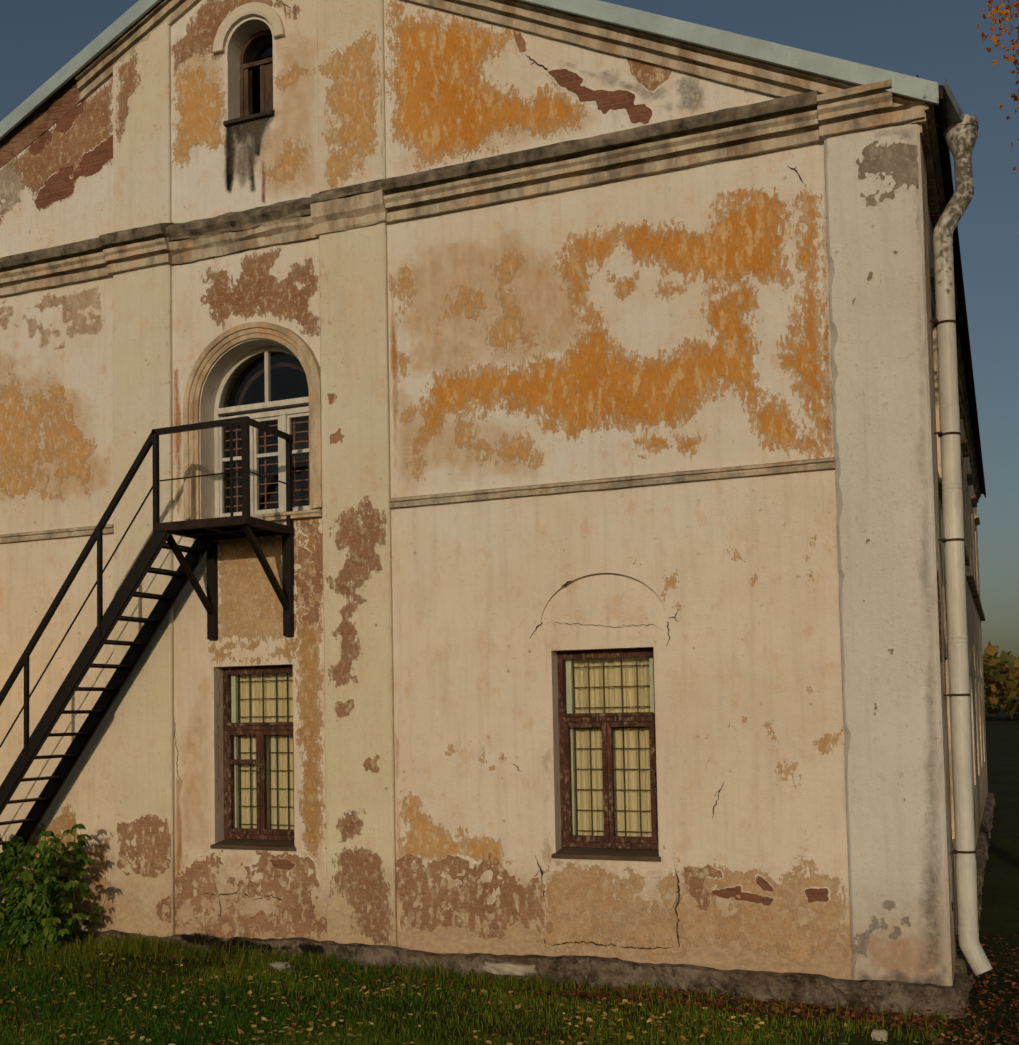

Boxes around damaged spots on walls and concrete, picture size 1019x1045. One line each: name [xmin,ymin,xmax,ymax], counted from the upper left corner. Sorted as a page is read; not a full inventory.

spalling [0,53,141,221]
peeling [264,138,312,184]
peeling [275,0,676,190]
spalling [200,248,320,337]
peeling [389,266,416,321]
peeling [397,186,833,480]
peeling [0,365,98,511]
crack [530,613,678,647]
peeling [22,496,913,970]
crack [534,857,545,898]
crack [544,869,680,950]